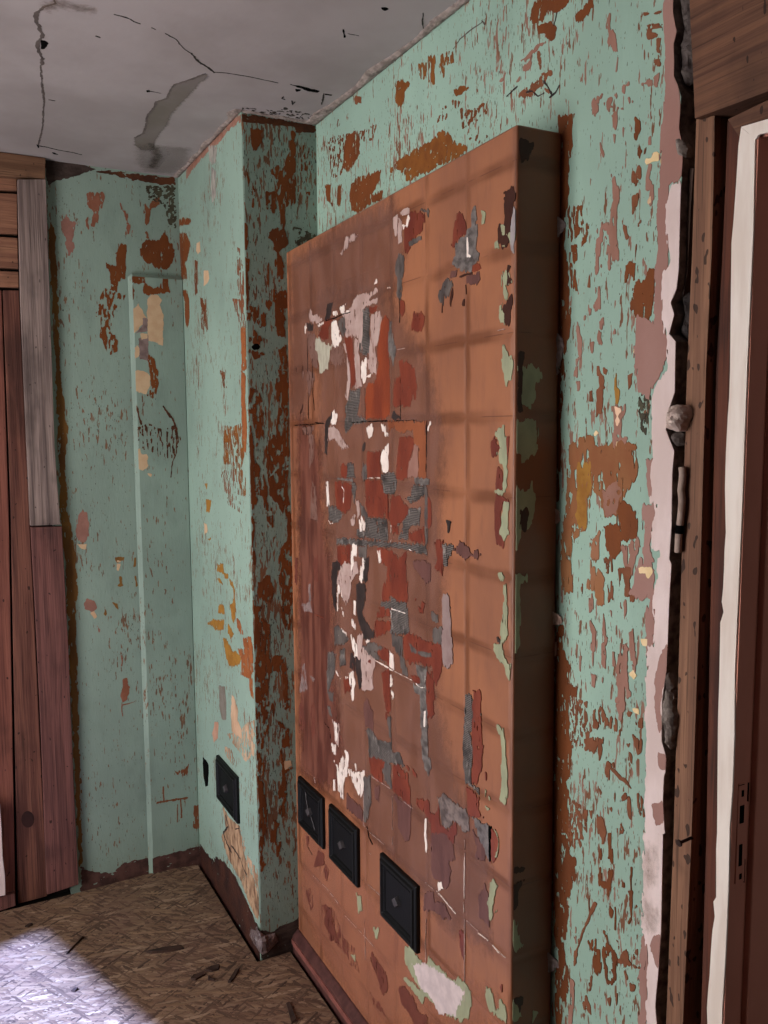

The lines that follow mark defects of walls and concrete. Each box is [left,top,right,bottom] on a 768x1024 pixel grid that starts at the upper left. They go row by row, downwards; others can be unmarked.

crack [33,0,82,155]
crack [114,14,332,138]
peeling [499,0,594,99]
flaking render [45,0,488,962]
flaking render [547,0,683,1024]